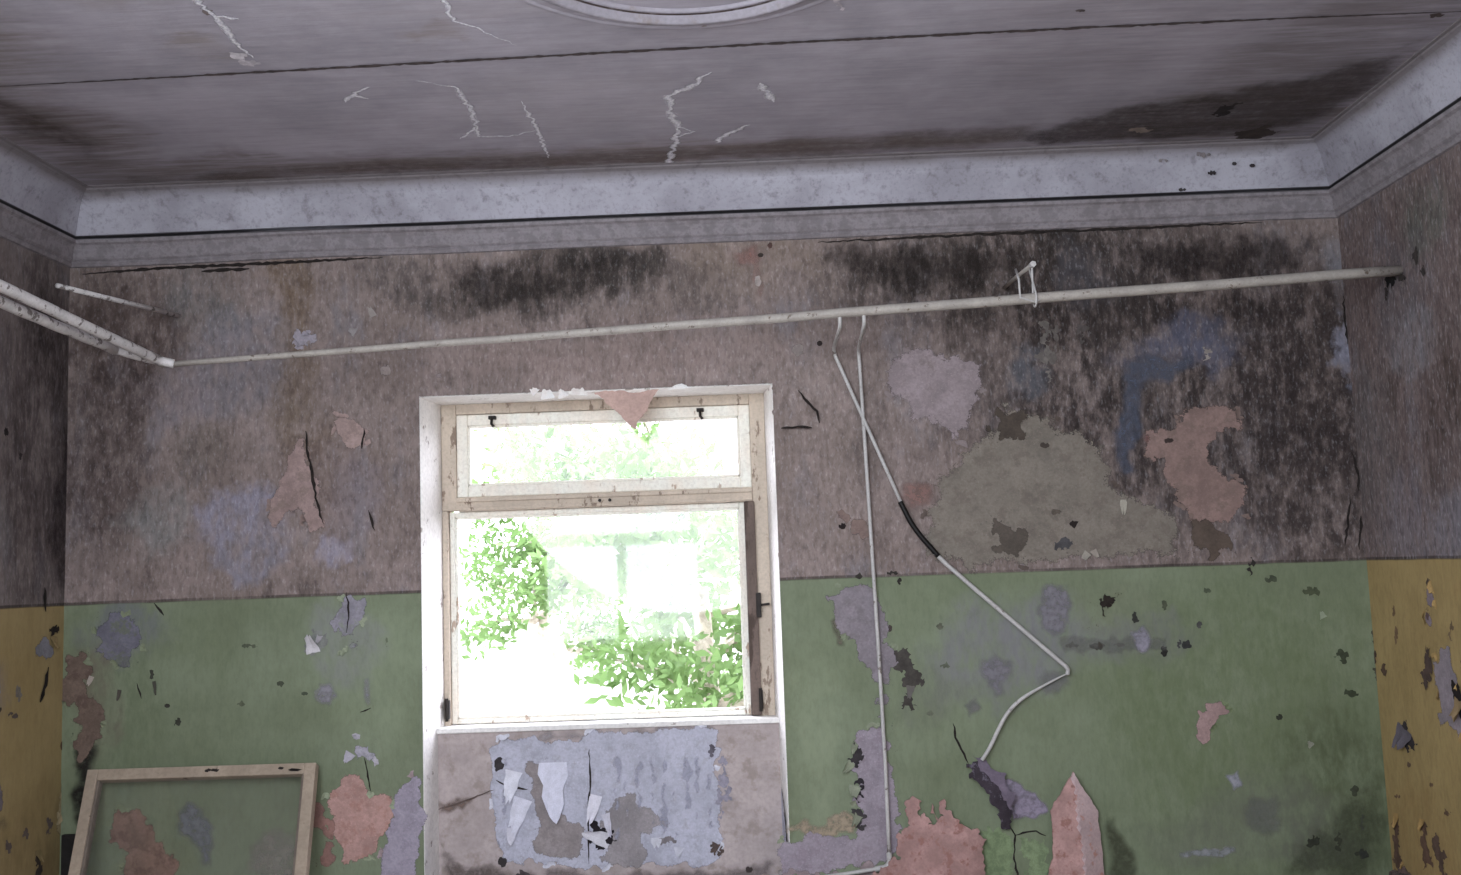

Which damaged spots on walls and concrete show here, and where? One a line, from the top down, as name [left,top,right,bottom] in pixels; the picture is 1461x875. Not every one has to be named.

crack [0,0,1461,163]
water stain [1039,64,1384,143]
peeling [266,431,325,533]
peeling [884,347,1277,583]
spalling [35,588,181,763]
flaking render [777,573,934,875]
spalling [1336,649,1349,664]
spalling [1371,630,1387,681]
peeling [5,817,53,875]
spalling [313,733,428,875]
peeling [489,725,732,875]
spalling [1391,794,1447,875]